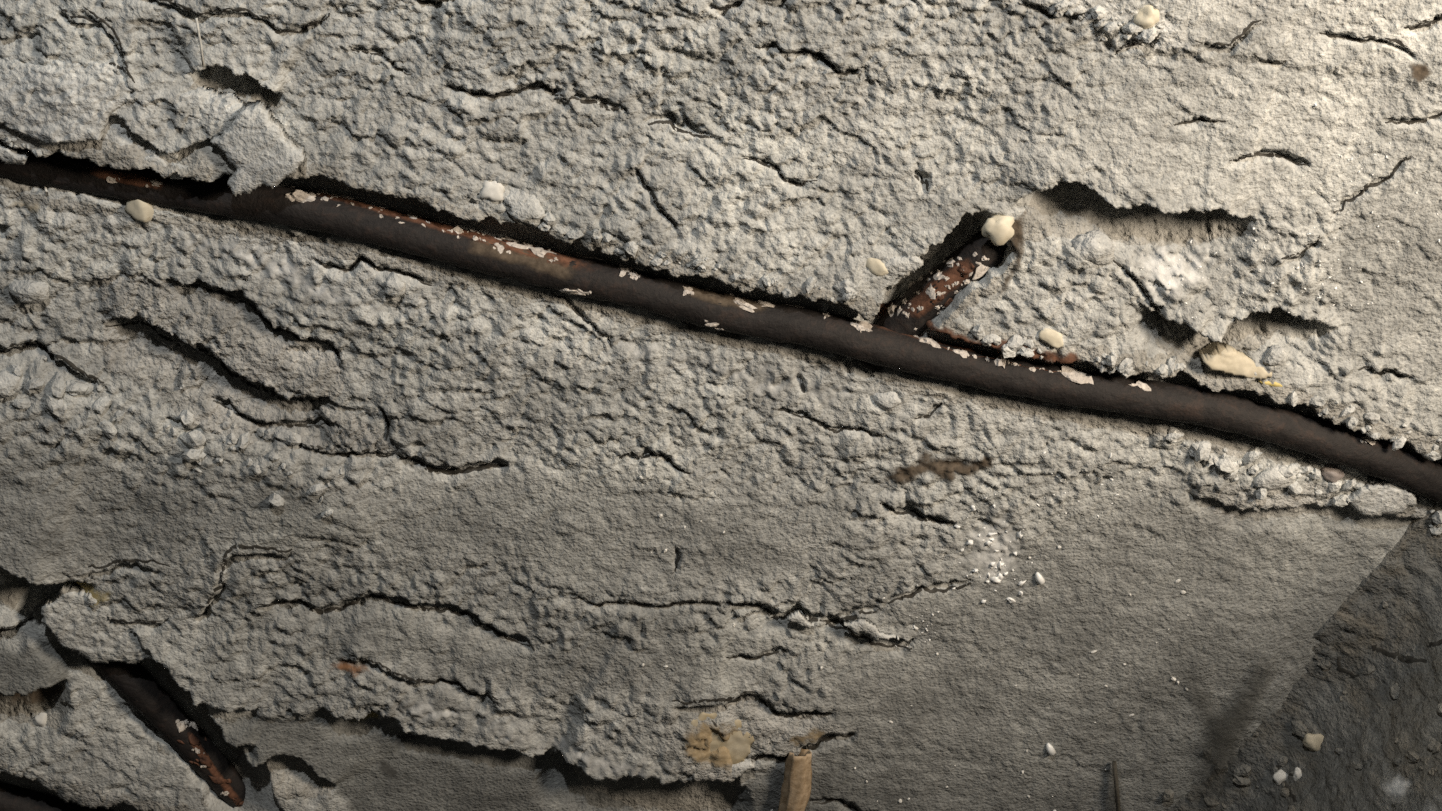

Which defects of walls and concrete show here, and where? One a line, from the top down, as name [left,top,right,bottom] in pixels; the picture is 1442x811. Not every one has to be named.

peeling [0,57,283,183]
spalling [94,273,413,457]
crack [105,282,508,475]
crack [315,257,432,286]
corrosion [314,191,578,278]
corrosion [691,287,764,311]
corrosion [910,262,1077,371]
corrosion [1002,218,1023,289]
spalling [883,371,1432,522]
spalling [935,182,1442,458]
crack [1272,112,1442,266]
crack [571,549,971,761]